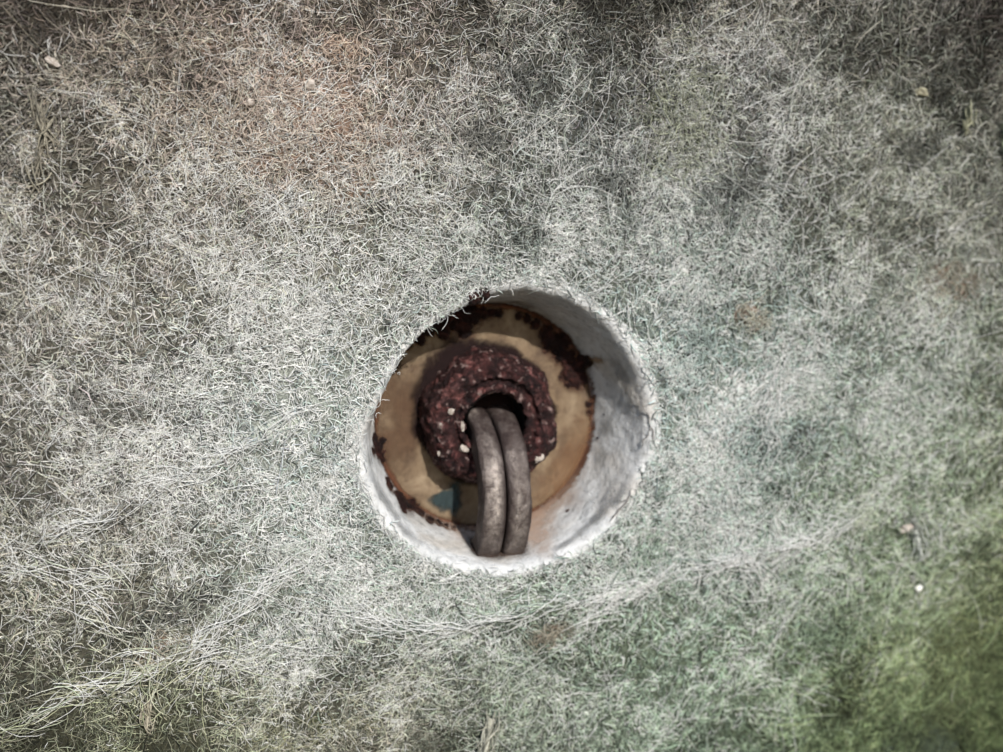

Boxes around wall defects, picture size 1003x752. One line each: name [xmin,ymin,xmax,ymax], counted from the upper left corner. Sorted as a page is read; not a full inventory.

rust [371,285,605,558]